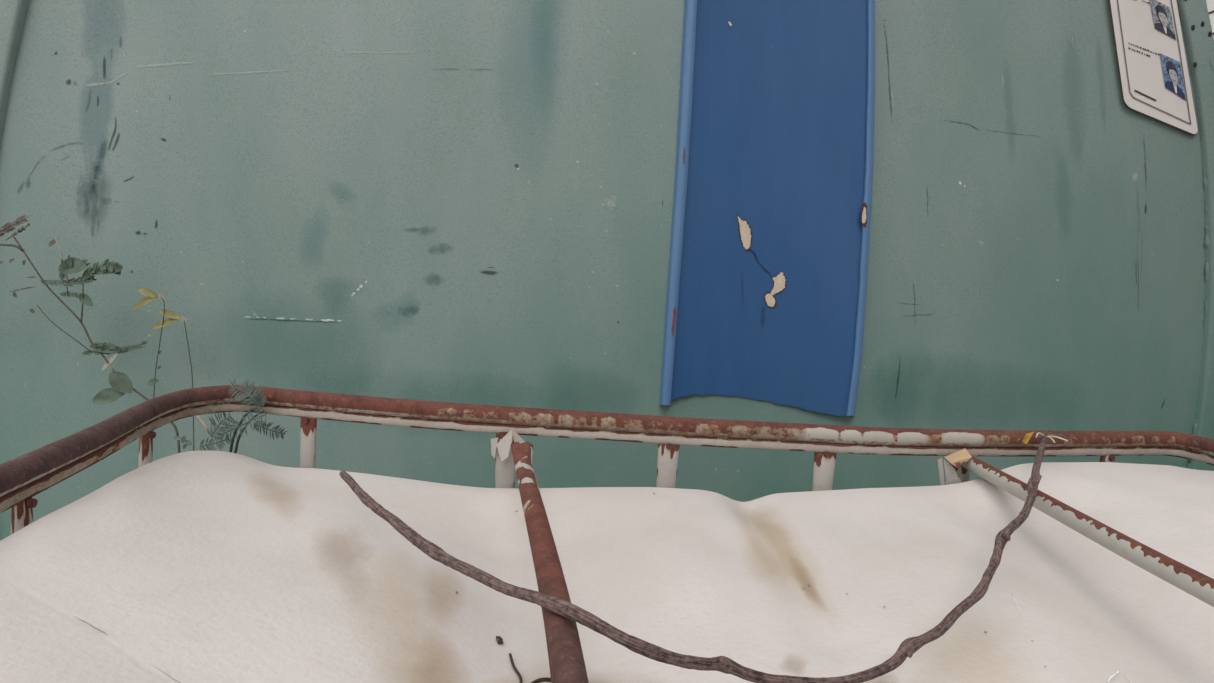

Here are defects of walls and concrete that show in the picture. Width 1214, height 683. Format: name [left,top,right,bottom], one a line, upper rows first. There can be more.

peeling [737,215,753,251]
peeling [763,271,787,308]